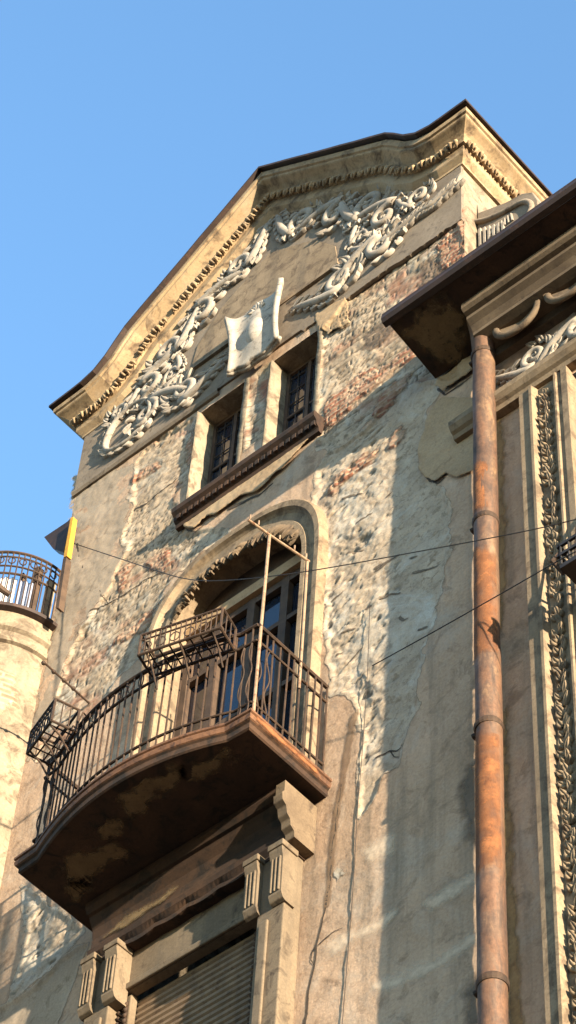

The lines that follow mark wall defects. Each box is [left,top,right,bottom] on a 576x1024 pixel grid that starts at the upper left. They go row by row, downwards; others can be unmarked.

peeling [32,208,473,819]
rust [473,418,507,659]
crack [303,712,358,1024]
rust [475,709,524,1024]